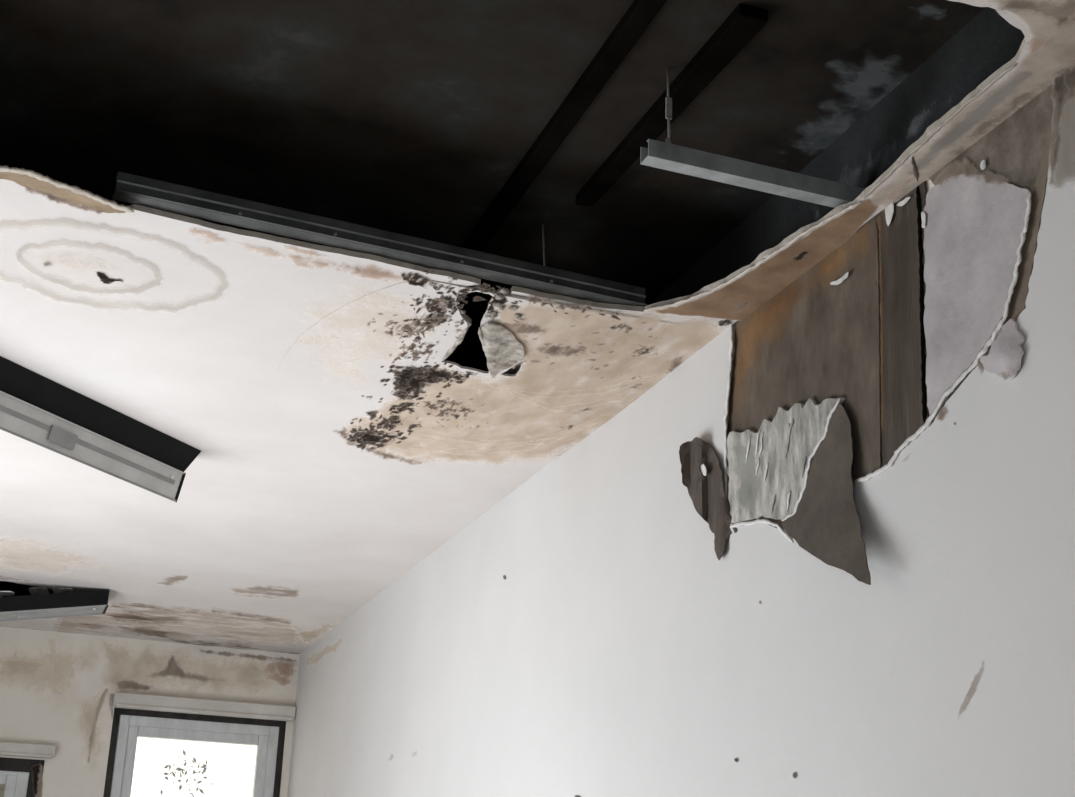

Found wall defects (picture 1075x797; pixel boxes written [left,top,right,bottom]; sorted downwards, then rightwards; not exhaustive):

leakage [0,219,227,312]
leakage [338,0,1075,464]
peeling [679,83,1057,585]
leakage [235,587,298,597]
leakage [58,603,341,762]